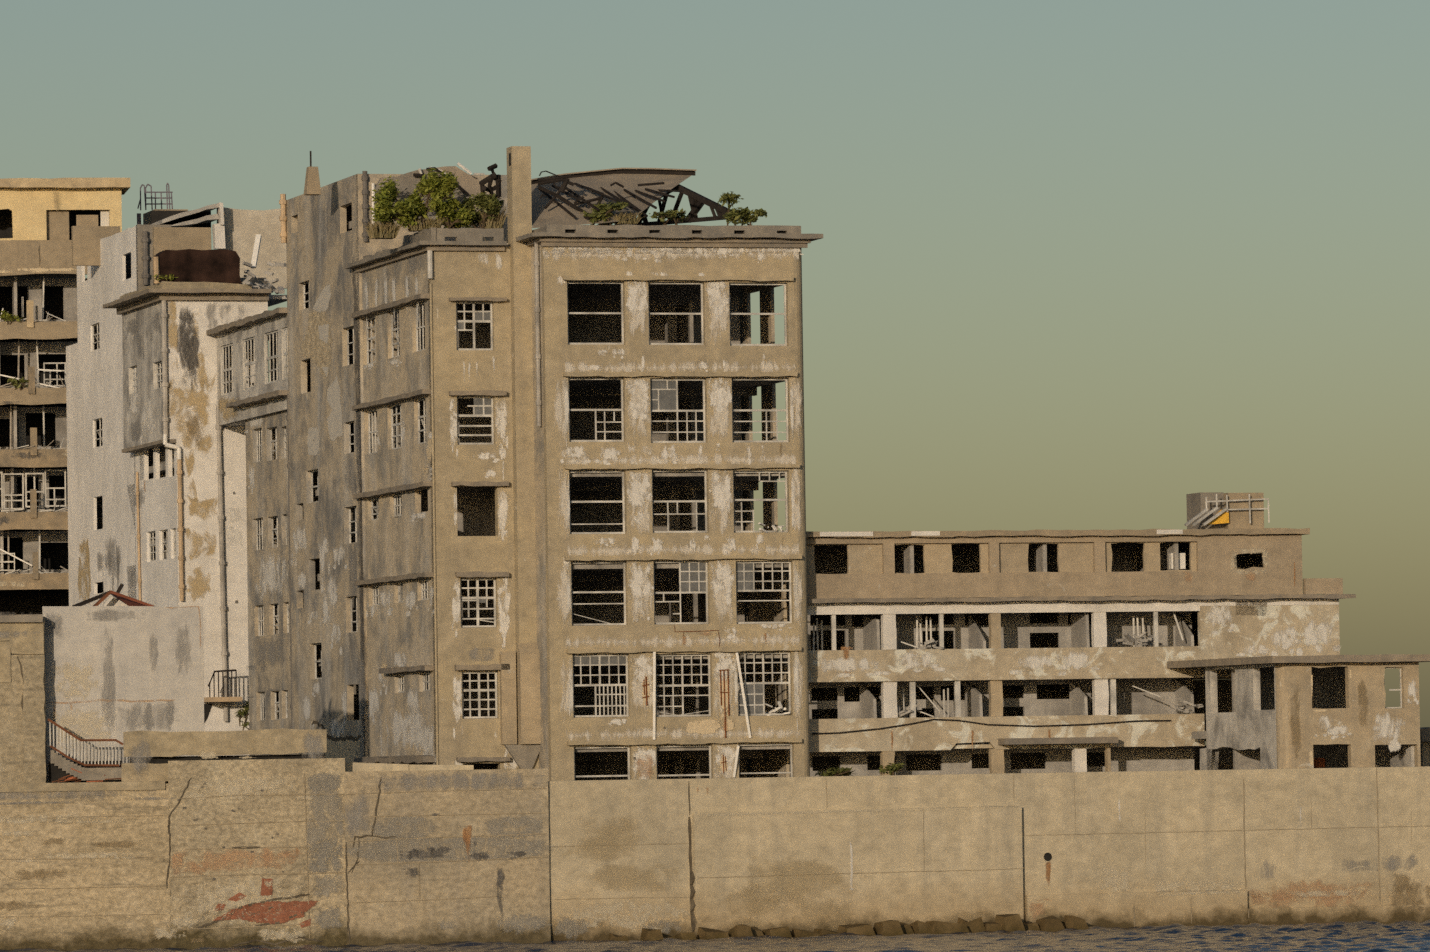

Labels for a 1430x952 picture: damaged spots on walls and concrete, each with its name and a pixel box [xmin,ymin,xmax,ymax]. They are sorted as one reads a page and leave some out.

peeling [553,247,670,318]
peeling [695,247,763,320]
peeling [626,357,650,420]
peeling [699,360,732,413]
peeling [560,389,677,622]
peeling [699,444,736,605]
leakage [104,661,174,729]
peeling [821,653,945,677]
peeling [1236,620,1340,657]
crack [166,777,192,888]
crack [197,778,396,947]
flaking render [213,871,342,946]